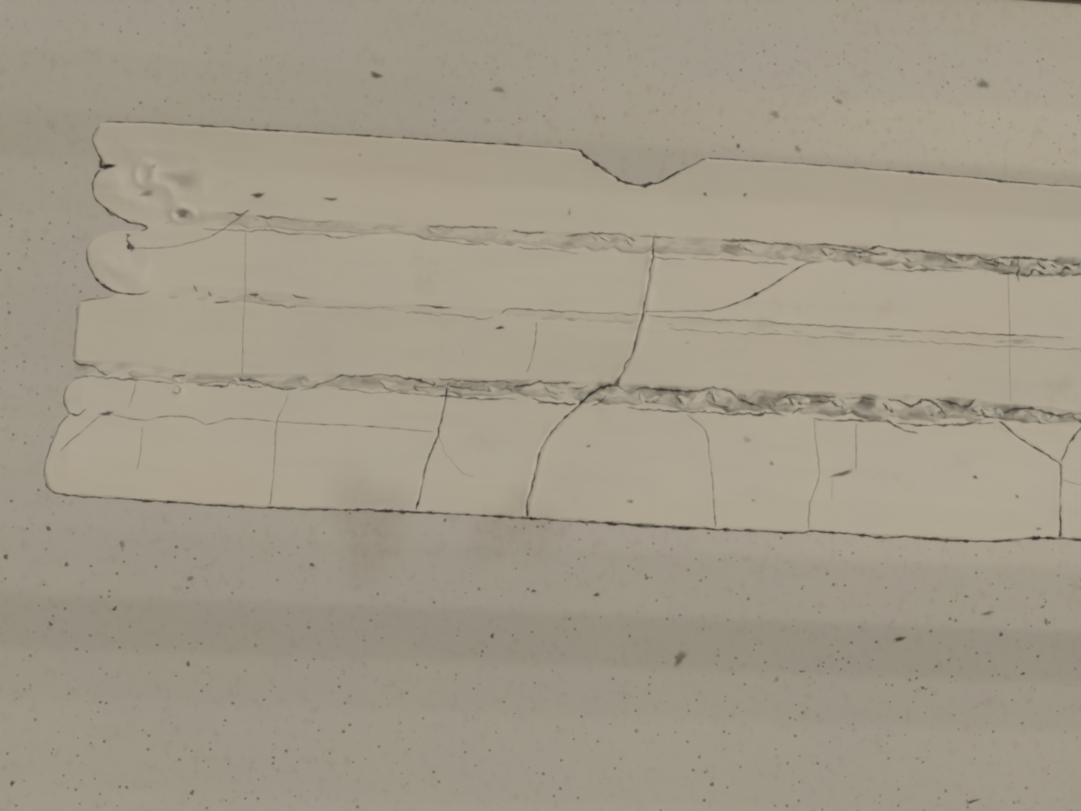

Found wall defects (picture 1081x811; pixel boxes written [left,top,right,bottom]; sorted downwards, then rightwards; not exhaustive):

crack [44,243,1081,543]
crack [92,121,1079,367]